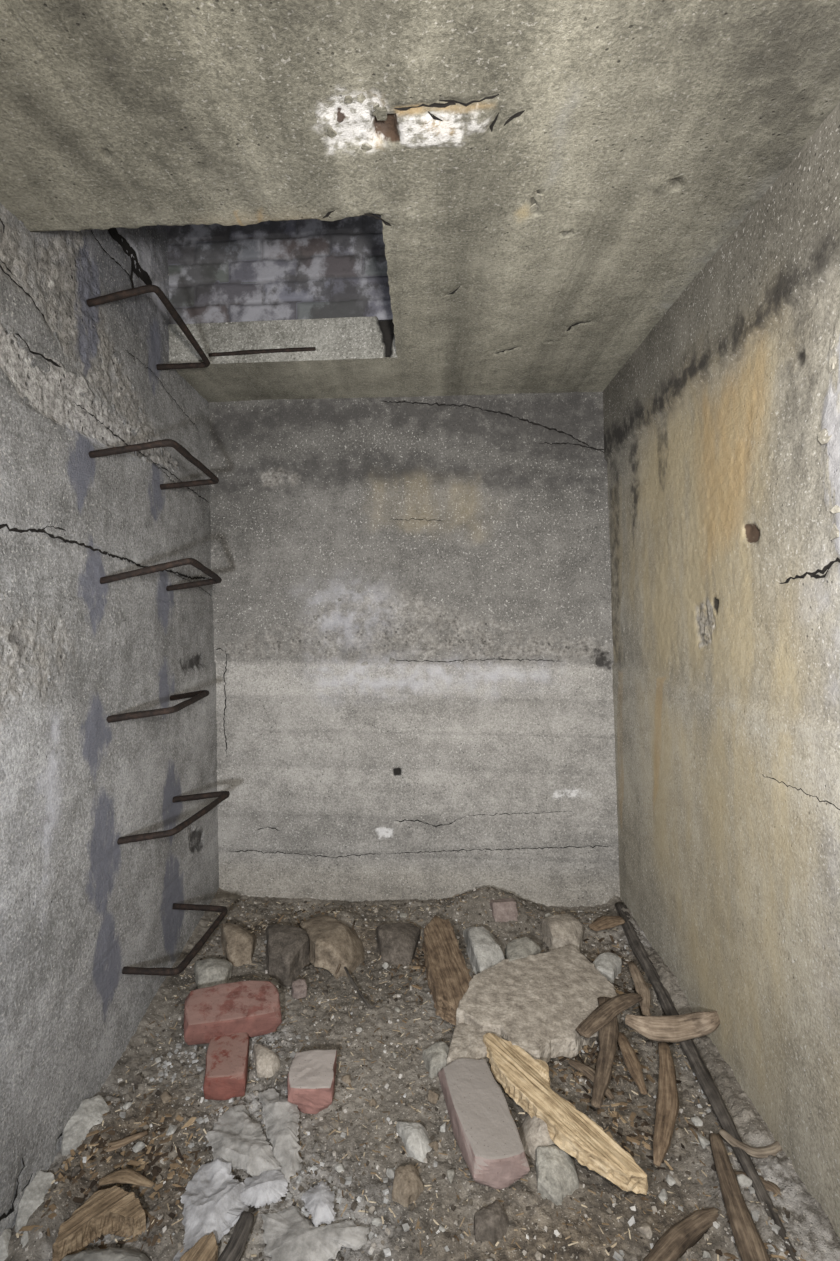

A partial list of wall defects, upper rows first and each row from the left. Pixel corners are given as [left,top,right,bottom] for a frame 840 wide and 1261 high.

peeling [298,87,399,162]
crack [91,228,152,288]
crack [384,400,604,453]
water stain [209,200,840,672]
crack [0,524,211,596]
crack [779,557,840,584]
water stain [277,554,579,718]
crack [762,774,840,810]
water stain [774,471,840,1080]